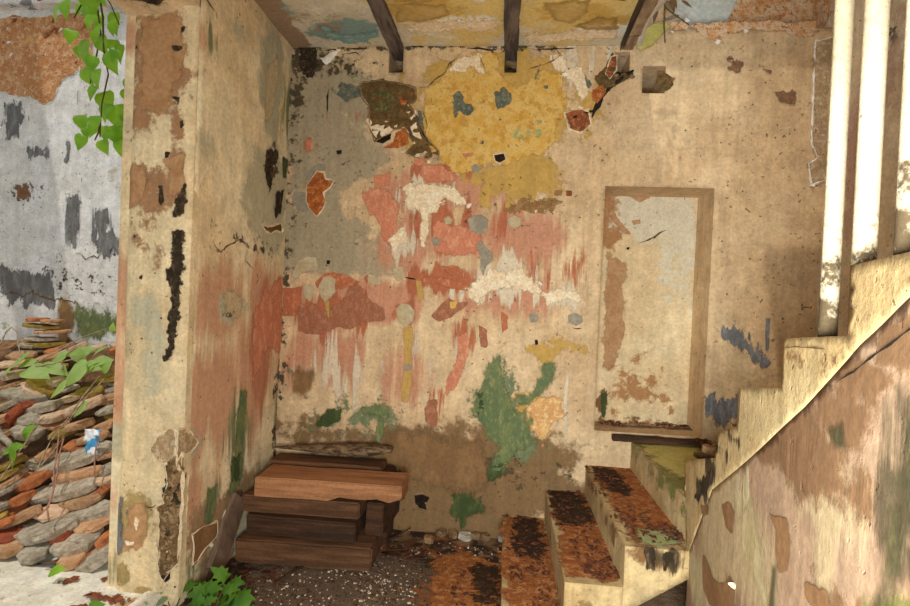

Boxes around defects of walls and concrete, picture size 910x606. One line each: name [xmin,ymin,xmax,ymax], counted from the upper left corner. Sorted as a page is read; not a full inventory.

flaking render [0,12,95,105]
leakage [135,0,187,115]
leakage [524,0,619,44]
peeling [359,51,635,183]
flaking render [262,149,334,234]
leakage [162,305,180,362]
peeling [253,260,415,382]
crack [836,328,910,383]
leakage [359,355,556,529]
flaking render [523,396,566,447]
spalling [150,427,226,583]
leakage [877,394,910,606]